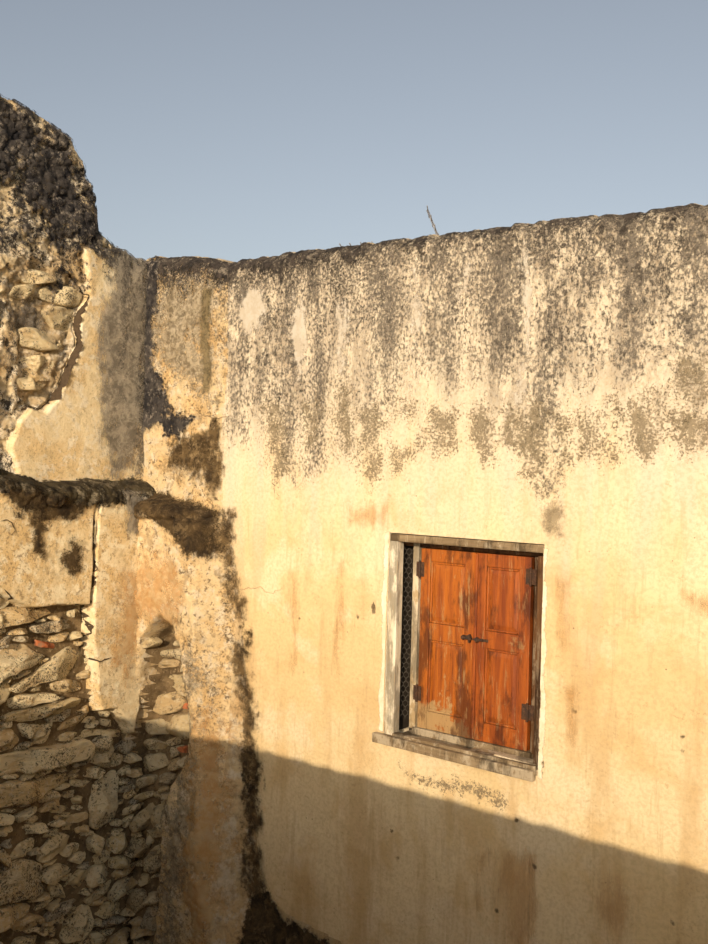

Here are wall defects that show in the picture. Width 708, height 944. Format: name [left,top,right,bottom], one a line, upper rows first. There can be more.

spalling [8,269,82,391]
crack [21,271,90,411]
water stain [95,203,708,537]
water stain [12,494,48,560]
water stain [60,535,84,576]